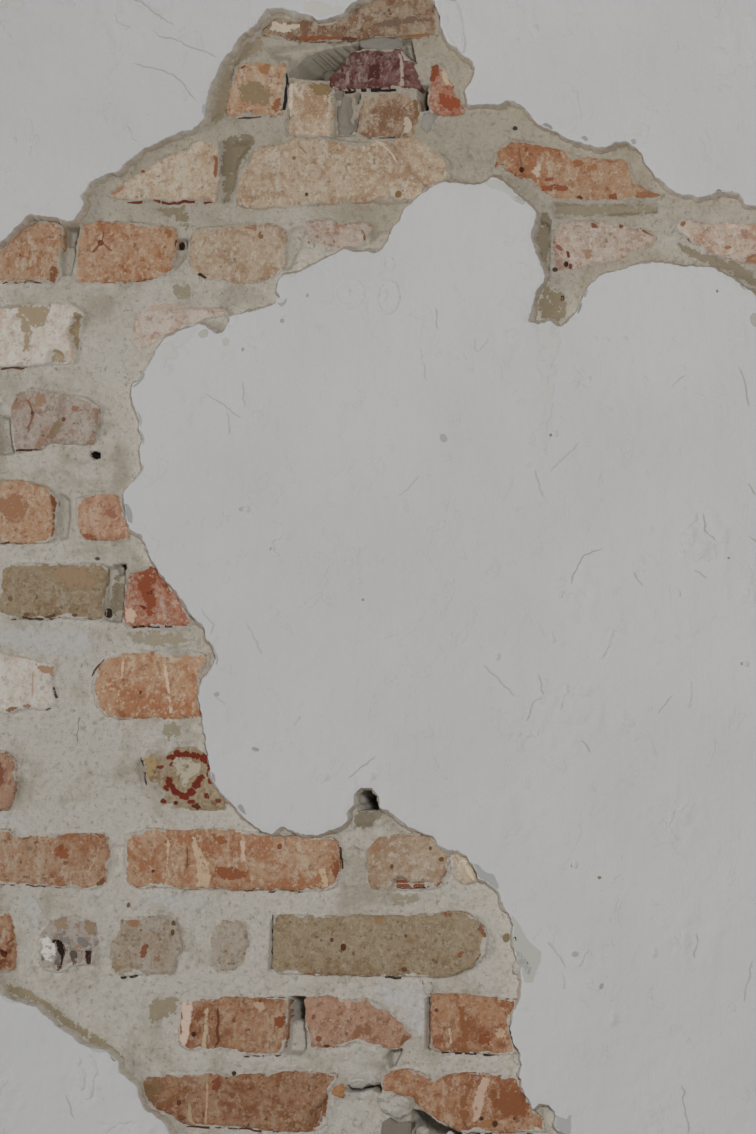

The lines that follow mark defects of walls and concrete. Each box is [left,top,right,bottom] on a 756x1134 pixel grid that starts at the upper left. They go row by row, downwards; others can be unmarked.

peeling [485,179,525,204]
spalling [69,312,83,349]
spalling [52,349,66,363]
spalling [390,846,447,888]
spalling [84,920,96,935]
peeling [503,915,541,983]
spalling [308,1095,328,1128]